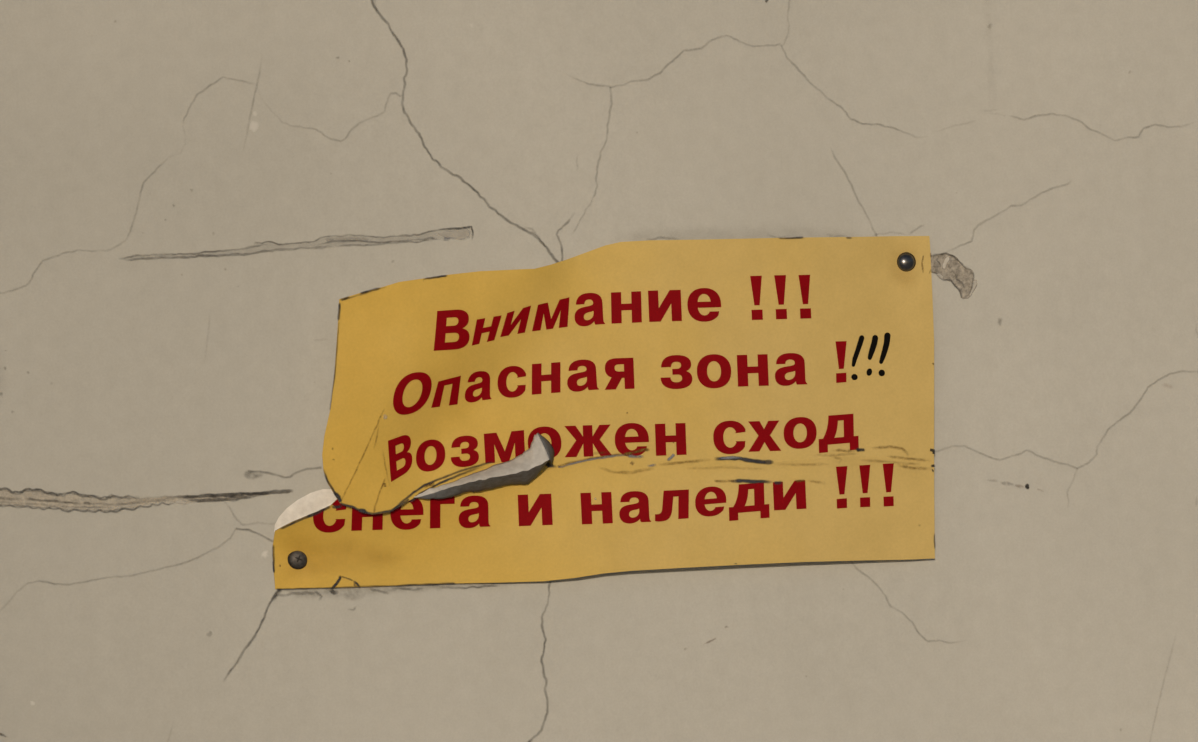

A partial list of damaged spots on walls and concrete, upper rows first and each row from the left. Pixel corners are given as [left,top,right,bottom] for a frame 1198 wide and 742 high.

spalling [931,253,977,299]